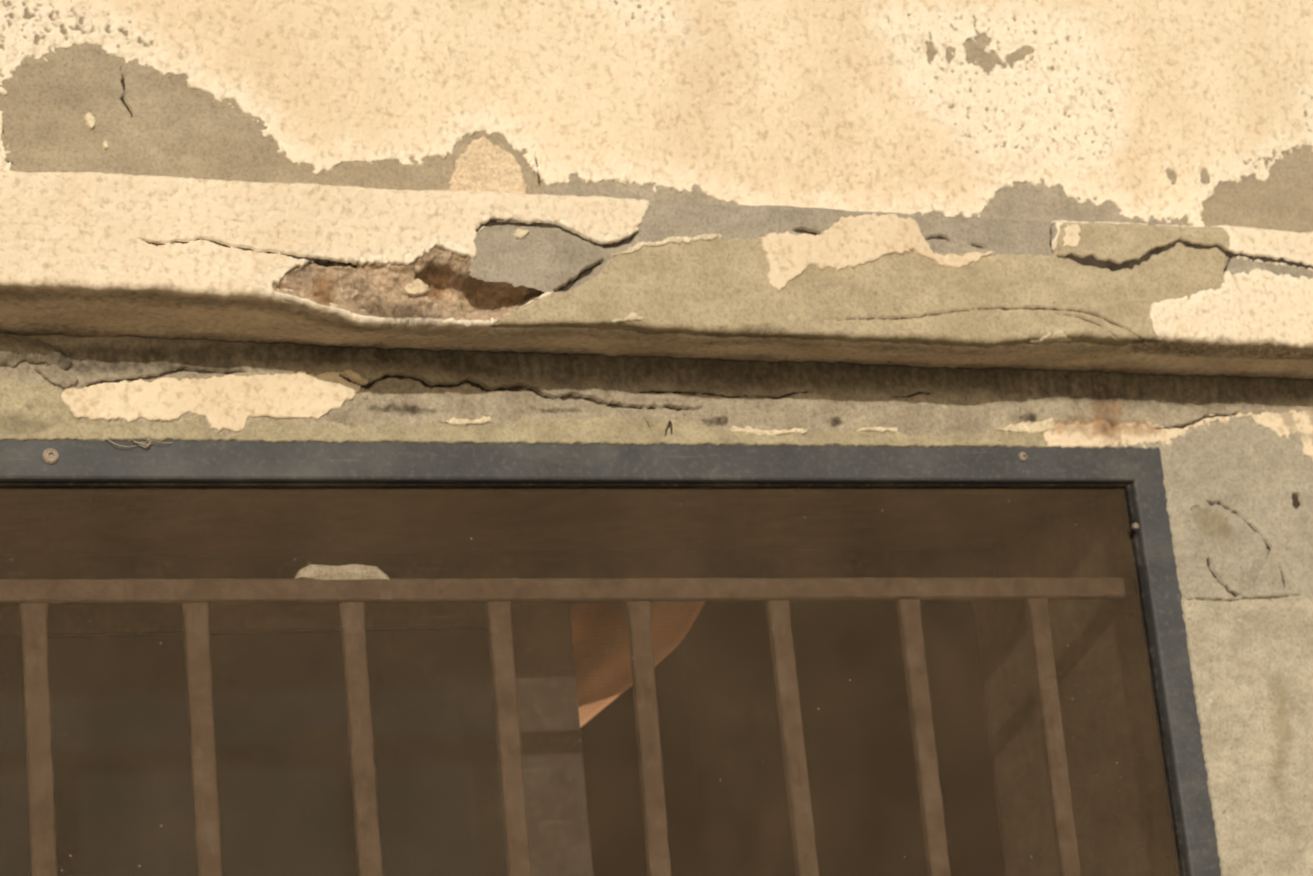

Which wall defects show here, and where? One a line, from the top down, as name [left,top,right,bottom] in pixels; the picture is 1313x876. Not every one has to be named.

flaking render [926,25,1034,76]
flaking render [0,43,1313,321]
crack [142,238,360,269]
crack [476,220,639,292]
crack [1050,228,1313,272]
peeling [610,312,644,324]
crack [86,368,245,387]
crack [339,375,808,436]
crack [894,391,930,399]
flaking render [0,332,1313,876]
crack [1187,565,1300,602]